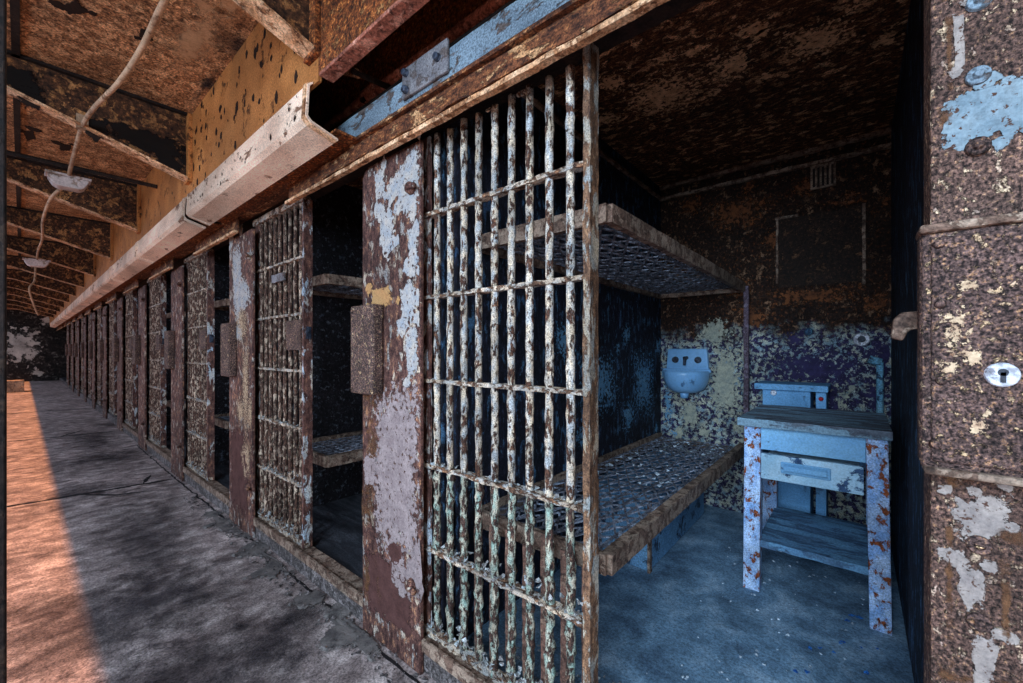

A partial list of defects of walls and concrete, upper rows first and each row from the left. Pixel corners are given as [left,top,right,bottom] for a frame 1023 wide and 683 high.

peeling [941,71,1023,153]
peeling [363,135,583,624]
rust [230,427,252,517]
peeling [937,484,1020,612]
peeling [971,628,1021,683]